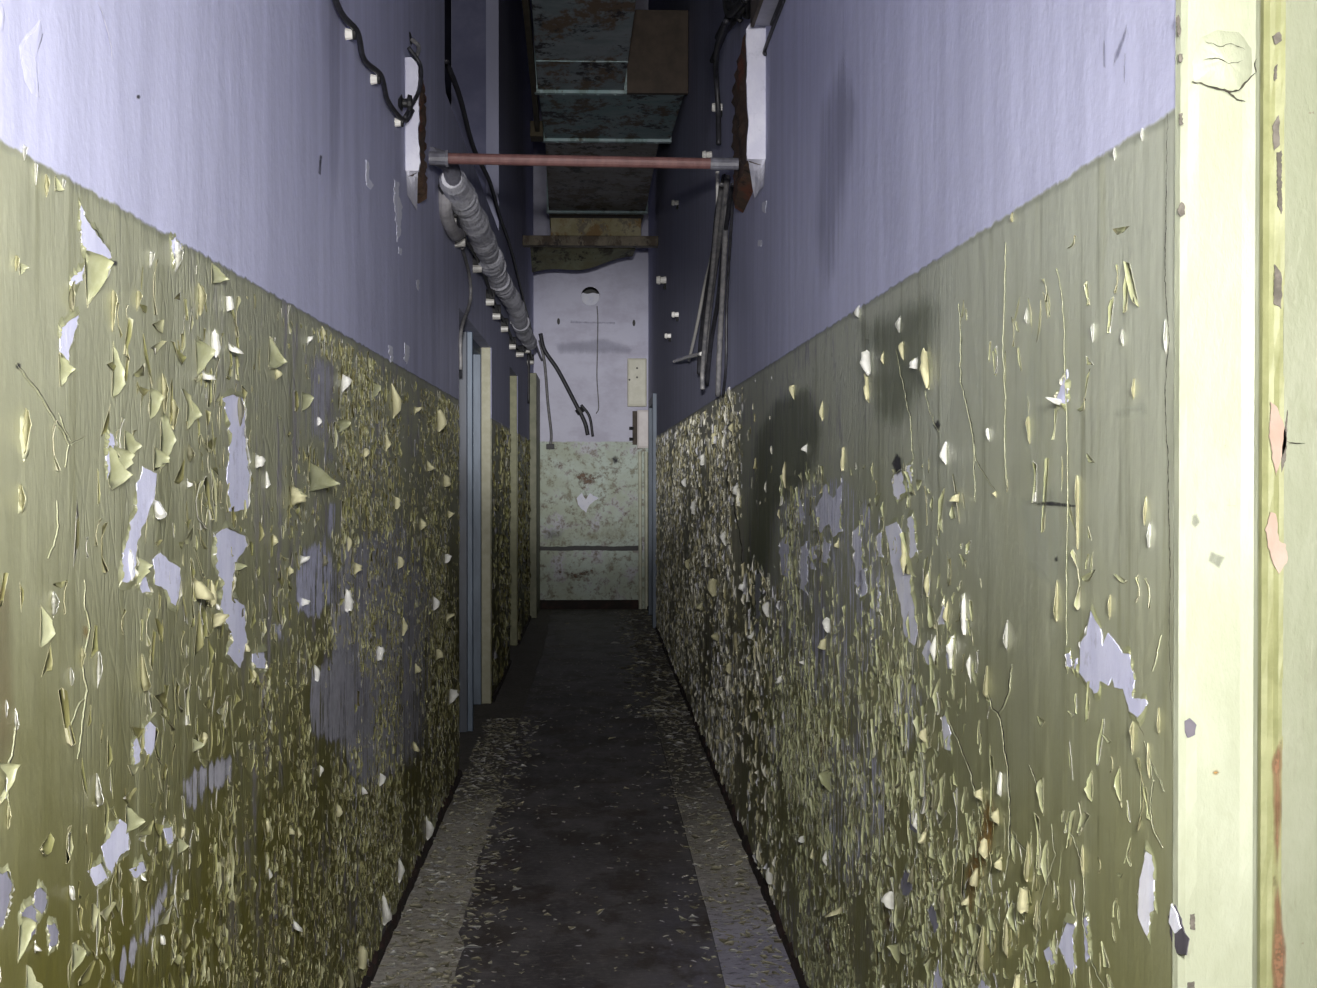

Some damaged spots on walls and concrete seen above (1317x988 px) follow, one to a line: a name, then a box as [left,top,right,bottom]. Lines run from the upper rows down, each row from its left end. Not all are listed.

crack [1192,42,1257,102]
peeling [22,144,66,197]
peeling [393,180,403,255]
peeling [859,317,930,402]
peeling [988,278,1050,384]
peeling [1045,261,1140,441]
damp [892,454,901,475]
spalling [1269,402,1288,472]
spalling [1265,512,1288,574]
peeling [0,197,460,988]
peeling [655,387,1195,988]